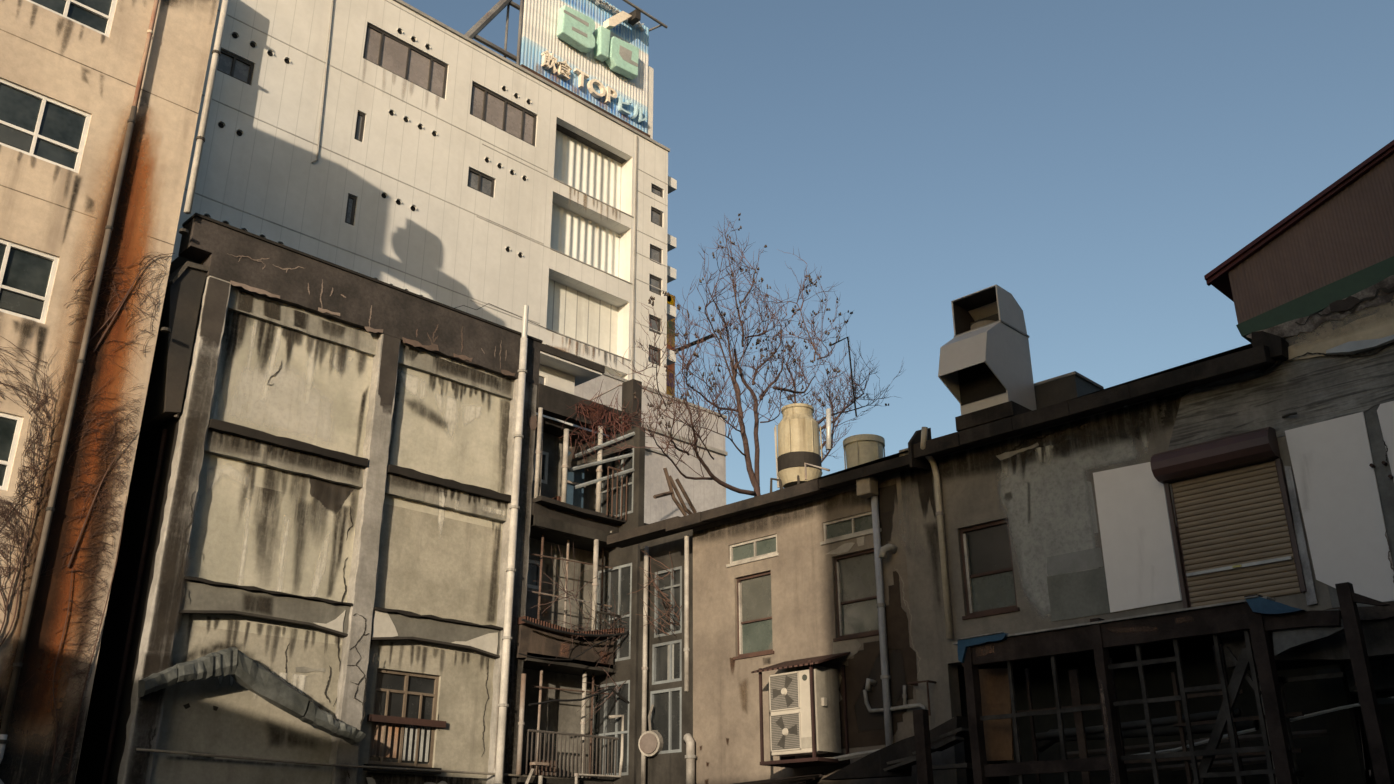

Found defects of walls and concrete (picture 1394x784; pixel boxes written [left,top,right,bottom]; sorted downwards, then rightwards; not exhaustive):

leakage [55,166,92,237]
spalling [1246,275,1394,339]
crack [1287,286,1394,361]
rust [11,120,151,736]
leakage [194,310,365,596]
leakage [357,390,367,442]
leakage [402,374,490,434]
leakage [438,488,507,532]
leakage [693,388,1196,568]
leakage [188,614,339,651]
crack [324,507,375,729]
leakage [488,549,498,621]